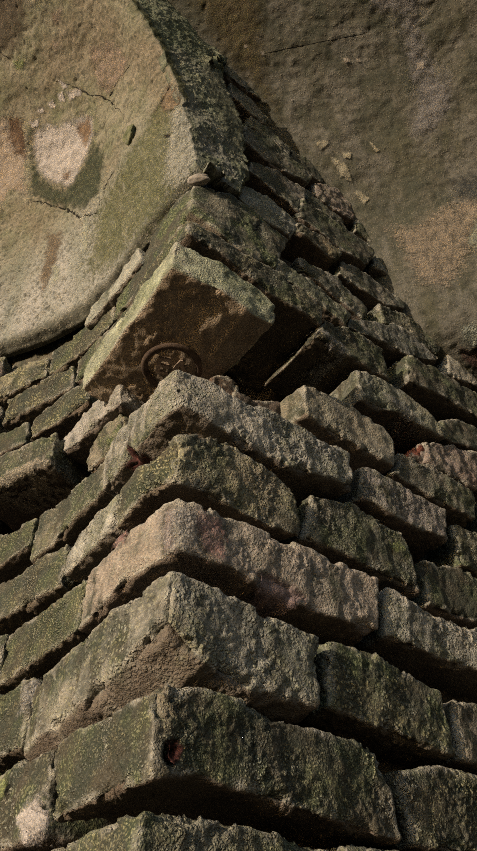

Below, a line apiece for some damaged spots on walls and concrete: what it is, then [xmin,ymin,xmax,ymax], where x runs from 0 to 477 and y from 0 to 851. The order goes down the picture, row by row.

crack [62,65,130,112]
crack [31,173,113,219]